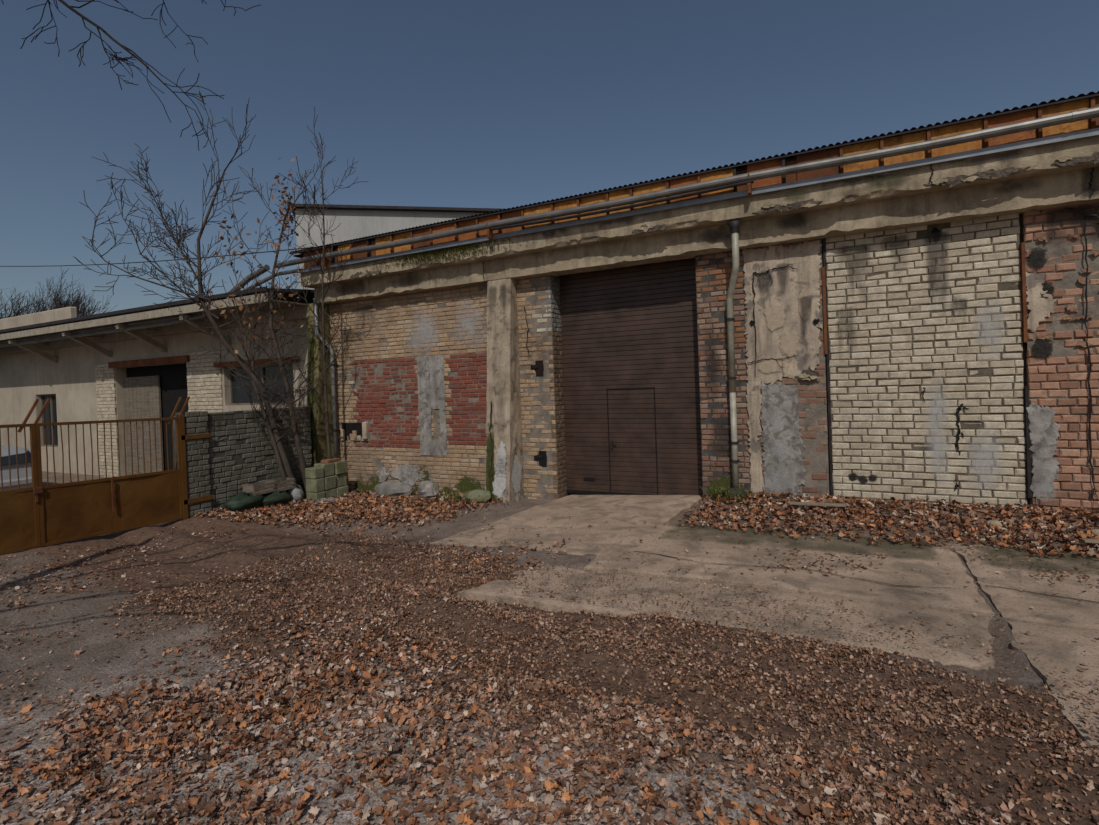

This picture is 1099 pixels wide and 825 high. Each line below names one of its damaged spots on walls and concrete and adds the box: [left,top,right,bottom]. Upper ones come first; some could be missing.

flaking render [742,240,823,497]
flaking render [1026,236,1095,358]
crack [1084,167,1099,513]
crack [954,404,968,490]
flaking render [1026,401,1060,502]